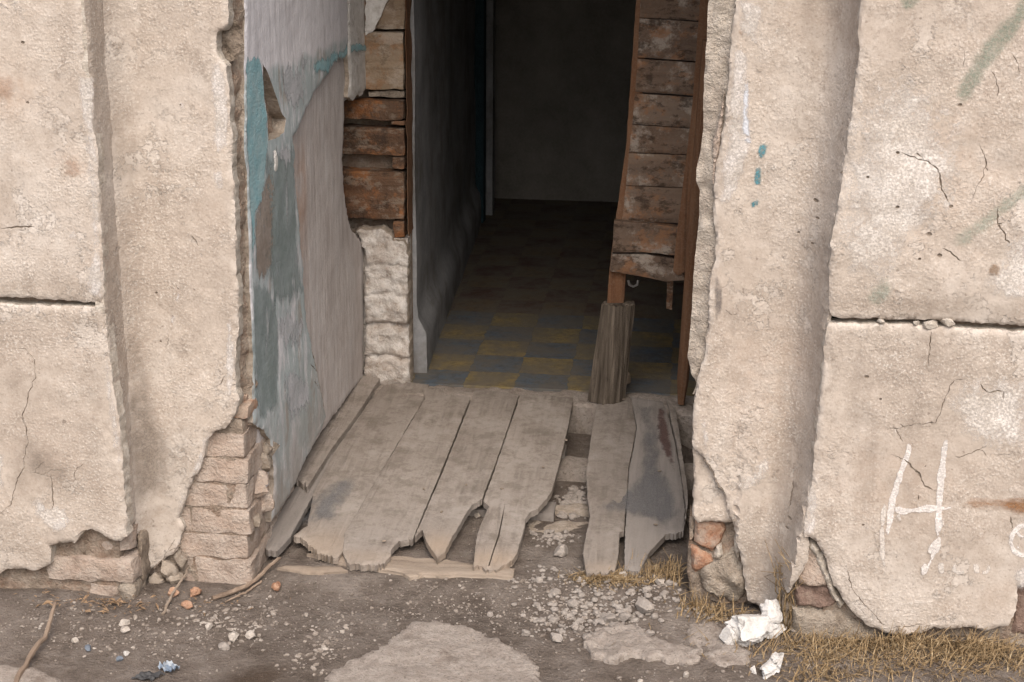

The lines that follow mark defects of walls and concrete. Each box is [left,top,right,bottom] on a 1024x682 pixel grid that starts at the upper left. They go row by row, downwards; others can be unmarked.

crack [902,147,988,207]
spalling [46,0,303,600]
crack [8,348,83,508]
crack [884,379,1004,500]
spalling [687,447,749,604]
spalling [780,537,879,637]